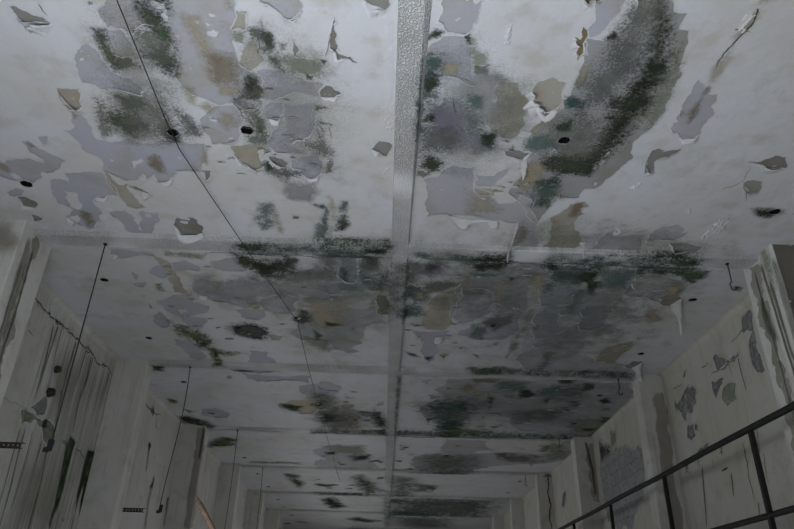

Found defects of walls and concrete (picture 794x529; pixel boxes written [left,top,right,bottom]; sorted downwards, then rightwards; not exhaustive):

damp [92,0,178,77]
peeling [0,0,325,234]
damp [232,161,512,352]
damp [415,34,500,178]
peeling [412,0,690,365]
damp [523,0,680,206]
peeling [670,80,718,145]
crack [716,9,759,68]
crack [35,298,112,374]
damp [313,367,632,486]
peeling [397,378,646,529]
peeling [711,264,794,456]